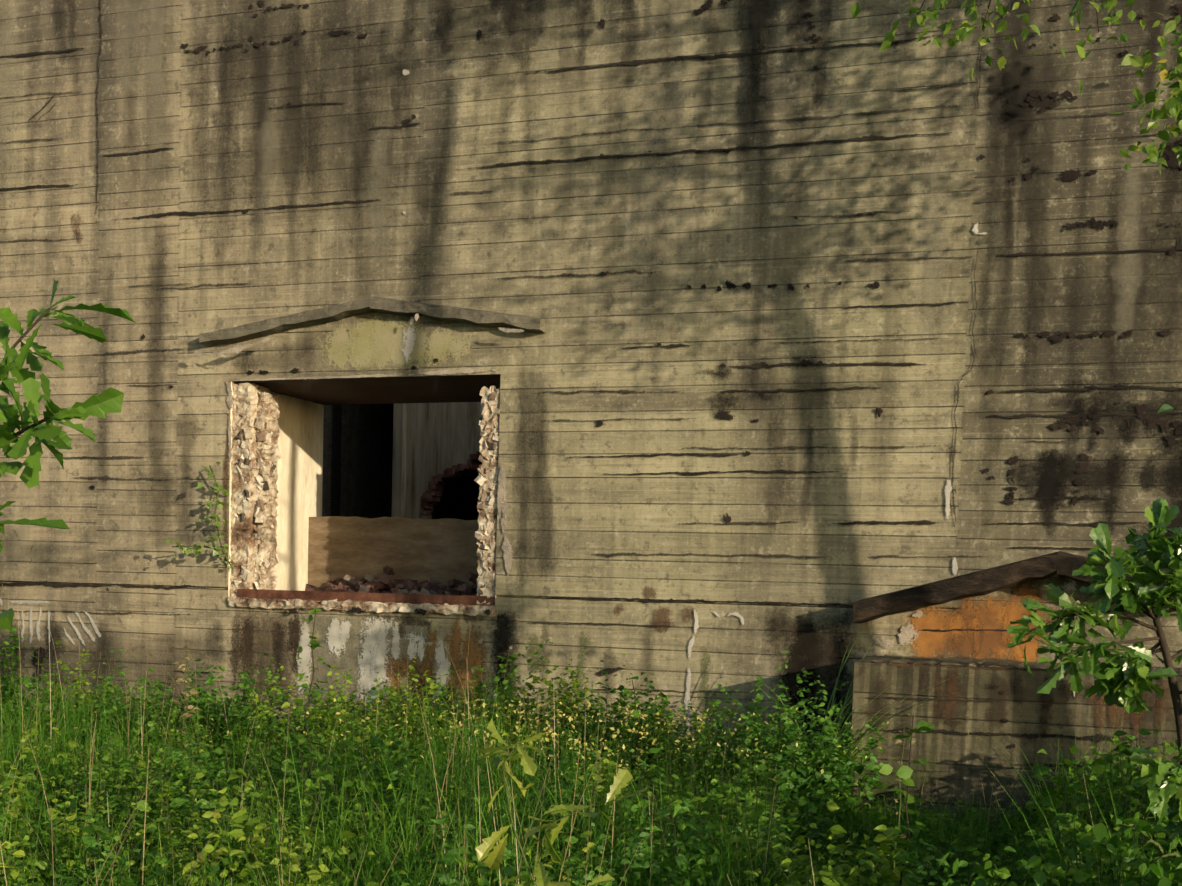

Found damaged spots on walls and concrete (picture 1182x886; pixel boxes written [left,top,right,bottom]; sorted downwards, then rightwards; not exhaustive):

crack [535,390,696,422]
crack [570,233,1182,559]
flaking render [223,358,497,590]
spalling [420,392,514,596]
leakage [1034,449,1076,535]
leakage [1141,456,1182,539]
peeling [288,609,312,697]
peeling [326,607,451,720]
corrosion [375,613,488,724]
leakage [767,606,859,751]
corrosion [878,583,1054,672]
leakage [1039,677,1077,734]